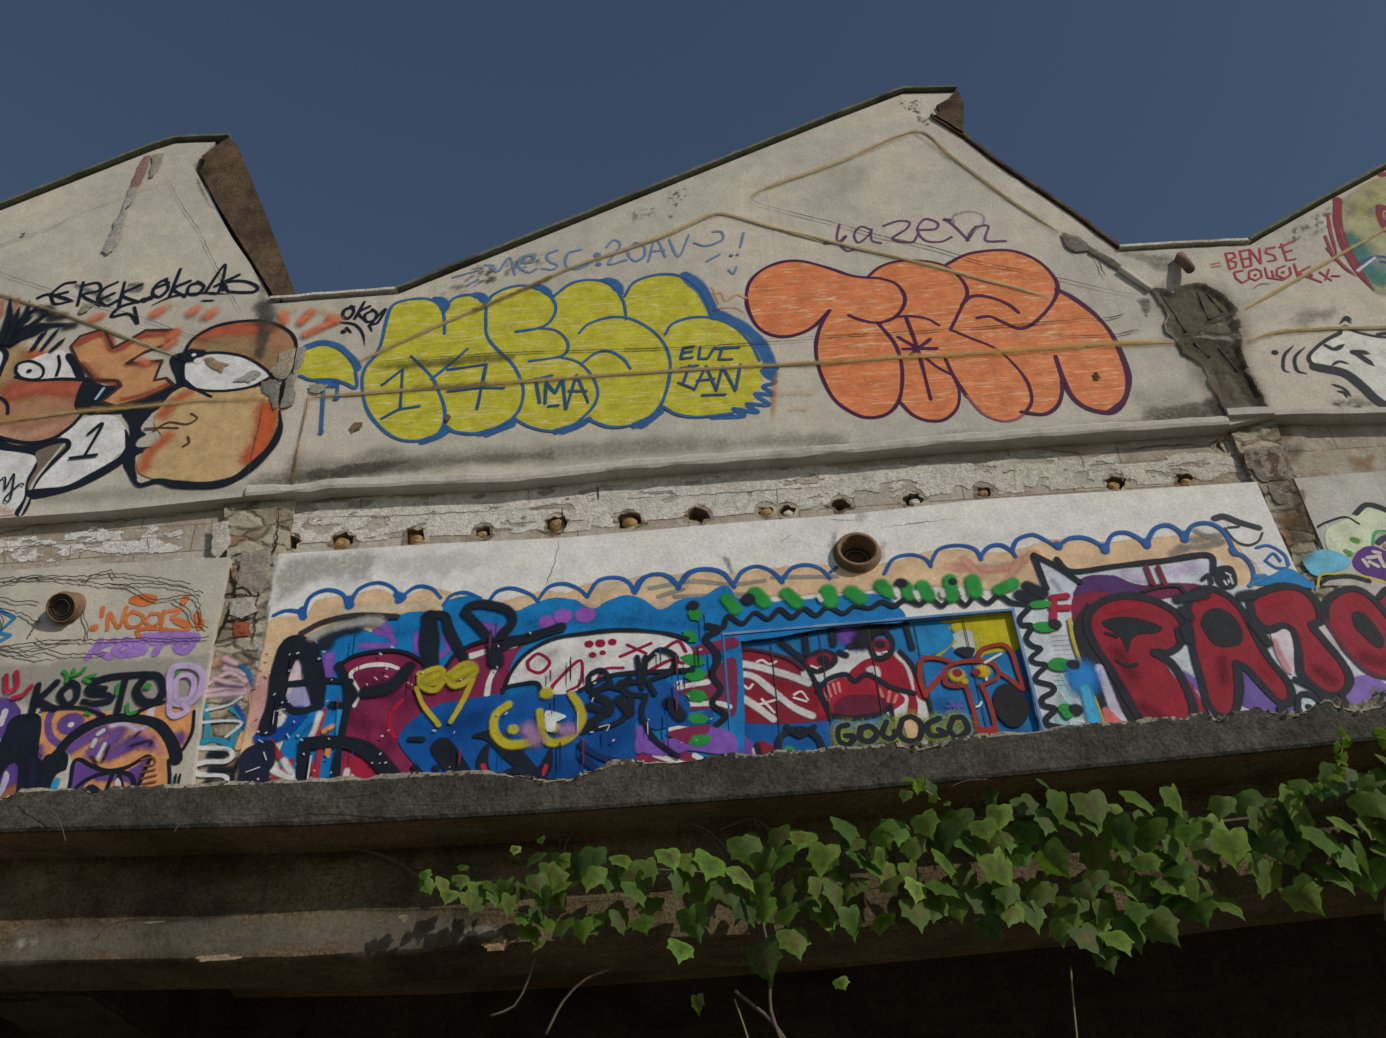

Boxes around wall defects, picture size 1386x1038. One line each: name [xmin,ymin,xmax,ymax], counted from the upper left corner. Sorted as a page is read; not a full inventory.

spalling [1152,283,1268,415]
crack [0,509,218,565]
crack [0,639,83,662]
peeling [0,436,1322,780]